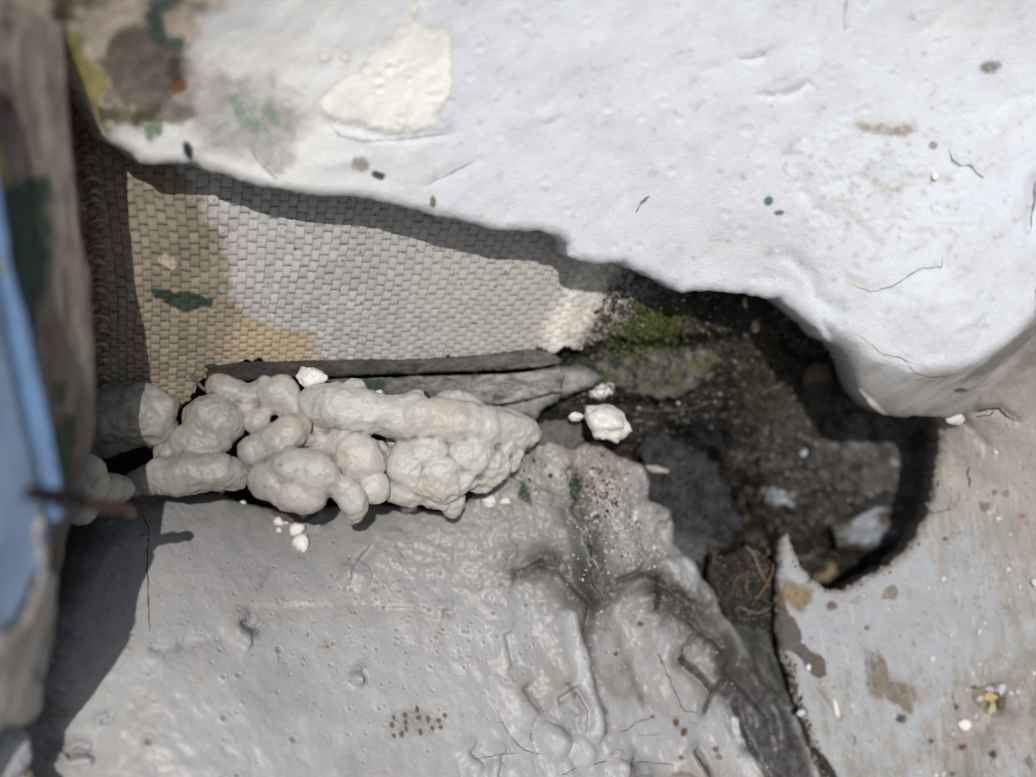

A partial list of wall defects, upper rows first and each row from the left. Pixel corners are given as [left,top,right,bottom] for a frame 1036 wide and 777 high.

peeling [318,20,454,134]
spalling [183,142,192,158]
peeling [353,158,385,179]
peeling [272,511,315,524]
crack [139,502,150,627]
peeling [882,586,897,599]
crack [652,644,701,725]
crack [476,693,540,759]
crack [729,673,789,777]